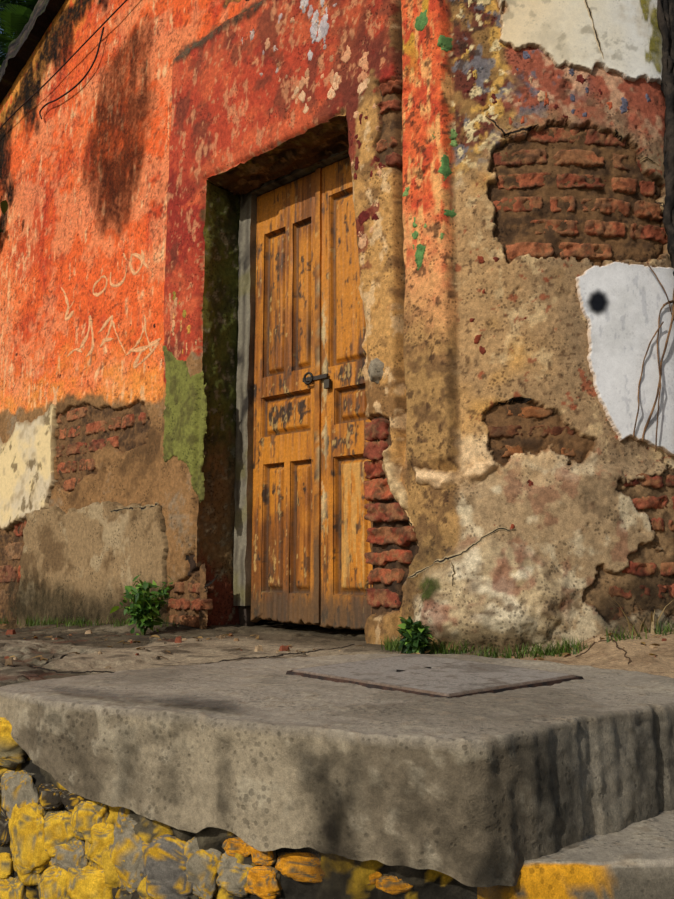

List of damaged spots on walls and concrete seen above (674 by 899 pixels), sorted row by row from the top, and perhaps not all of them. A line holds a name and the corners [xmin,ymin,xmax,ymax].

damp [0,0,107,246]
damp [83,28,150,232]
peeling [468,0,663,114]
crack [584,0,604,59]
spalling [477,90,674,465]
peeling [163,291,207,502]
crack [1,654,114,673]
peeling [0,402,151,621]
crack [202,644,355,664]
spalling [363,416,419,615]
crack [407,527,516,586]
spalling [582,470,674,620]